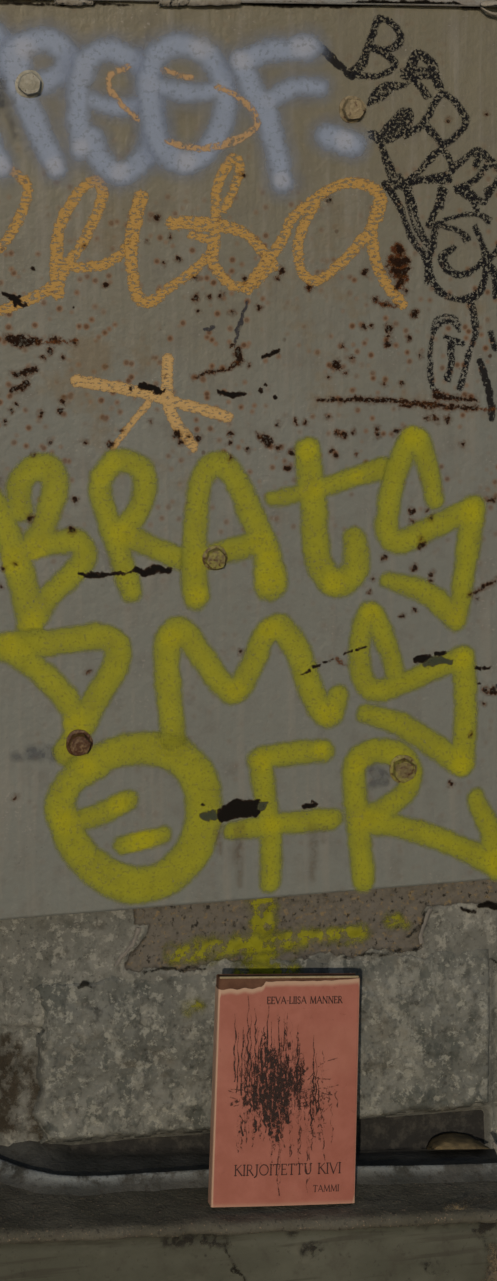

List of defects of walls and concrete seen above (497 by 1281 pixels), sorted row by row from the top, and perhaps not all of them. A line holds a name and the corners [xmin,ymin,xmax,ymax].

corrosion [373,242,419,318]
corrosion [4,334,78,425]
corrosion [195,343,251,379]
corrosion [361,323,393,348]
corrosion [227,417,307,471]
corrosion [316,381,496,458]
corrosion [408,508,434,582]